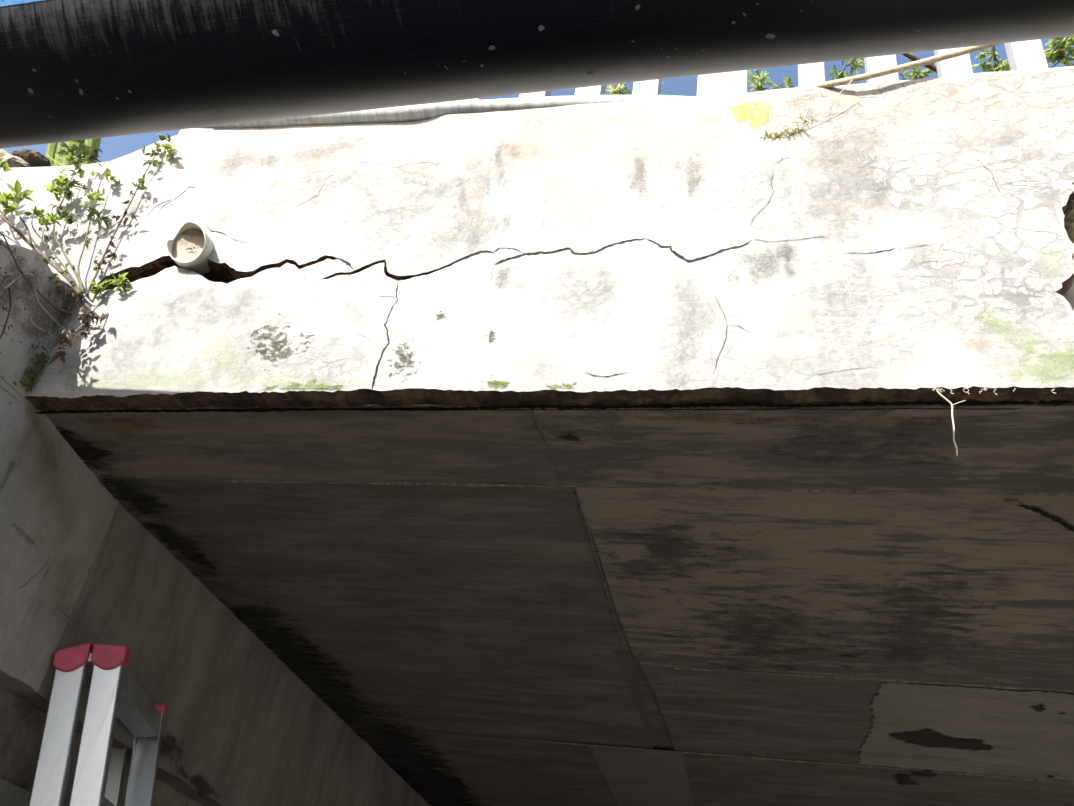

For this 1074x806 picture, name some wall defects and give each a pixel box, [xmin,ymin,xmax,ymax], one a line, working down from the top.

crack [450,66,1074,376]
spalling [1064,196,1074,245]
damp [247,313,312,371]
crack [0,257,1074,414]
damp [56,427,232,588]
damp [603,518,751,593]
damp [680,556,998,677]
damp [221,601,480,806]
damp [159,734,219,797]